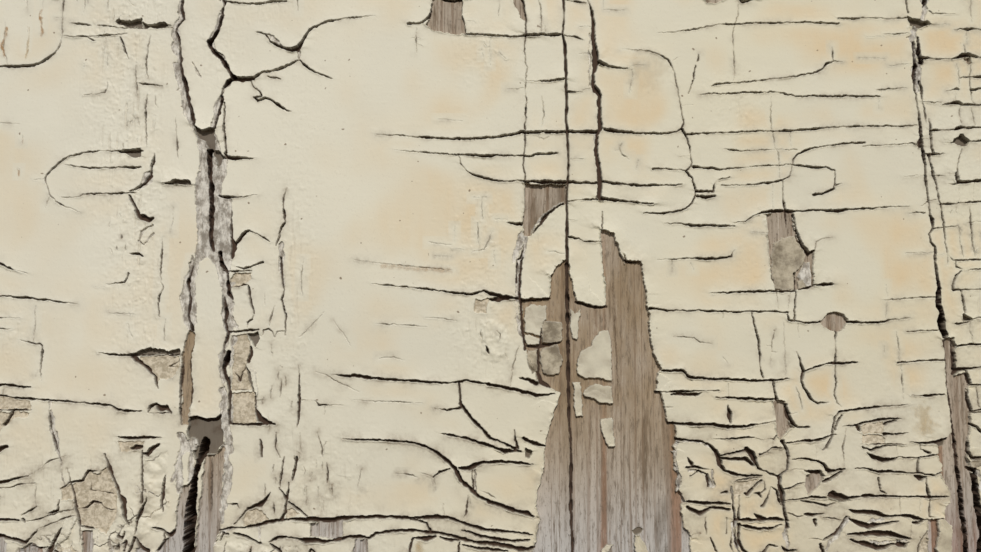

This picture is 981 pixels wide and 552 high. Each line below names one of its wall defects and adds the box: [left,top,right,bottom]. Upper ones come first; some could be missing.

peeling [406,0,475,35]
peeling [513,0,524,20]
crack [0,0,376,552]
crack [259,0,981,552]
peeling [733,206,911,290]
peeling [97,347,183,390]
peeling [127,130,729,552]
peeling [0,432,200,552]